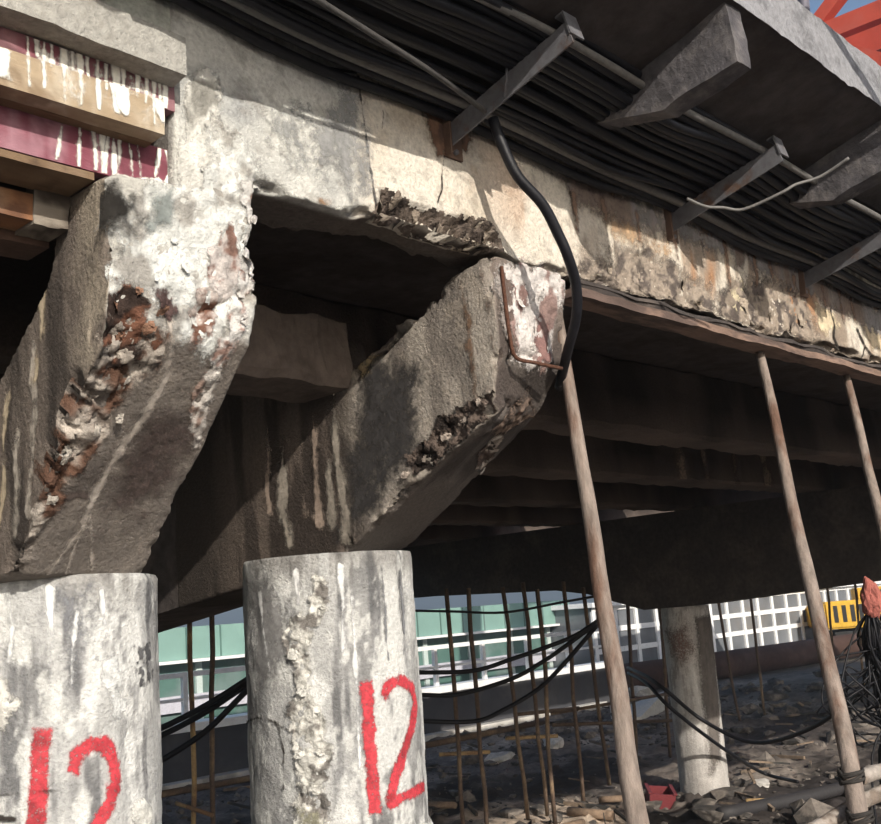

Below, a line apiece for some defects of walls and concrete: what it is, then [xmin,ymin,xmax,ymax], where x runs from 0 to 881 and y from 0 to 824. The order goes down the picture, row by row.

crack [358,76,384,208]
peeling [28,67,266,538]
rust [207,223,246,303]
spalling [369,187,504,255]
rust [486,272,529,358]
peeling [494,256,565,374]
rust [534,312,552,362]
crack [830,309,839,352]
crack [857,328,874,358]
water stain [0,290,47,538]
water stain [264,439,293,548]
water stain [303,414,352,545]